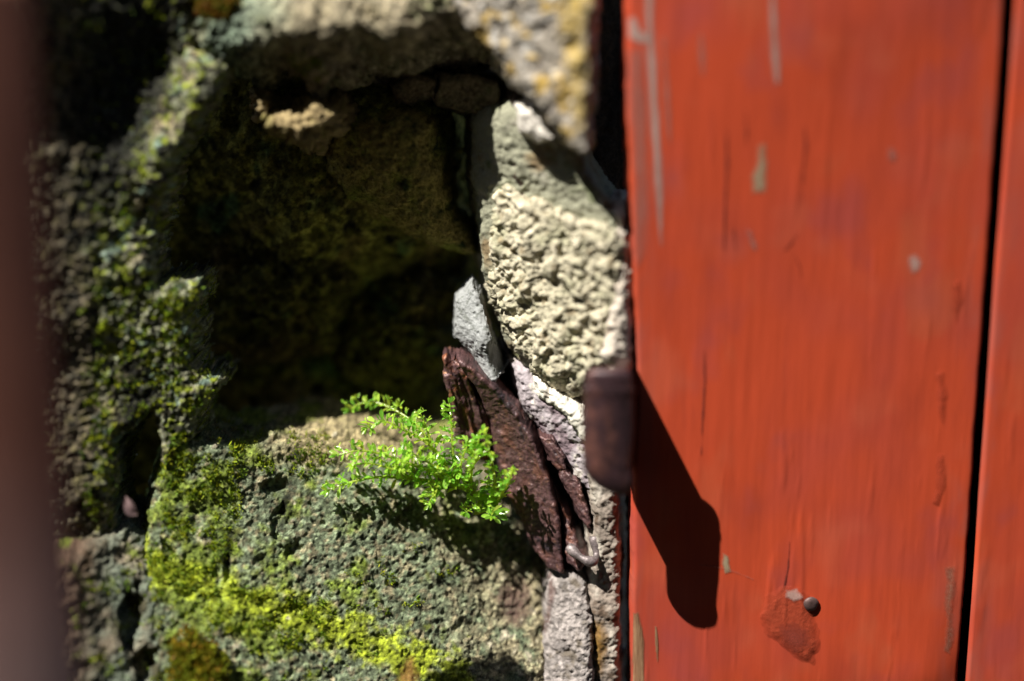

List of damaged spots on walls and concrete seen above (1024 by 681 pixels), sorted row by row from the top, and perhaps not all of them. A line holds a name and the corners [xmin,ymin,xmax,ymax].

peeling [629,0,670,229]
peeling [753,148,764,190]
peeling [764,589,816,658]